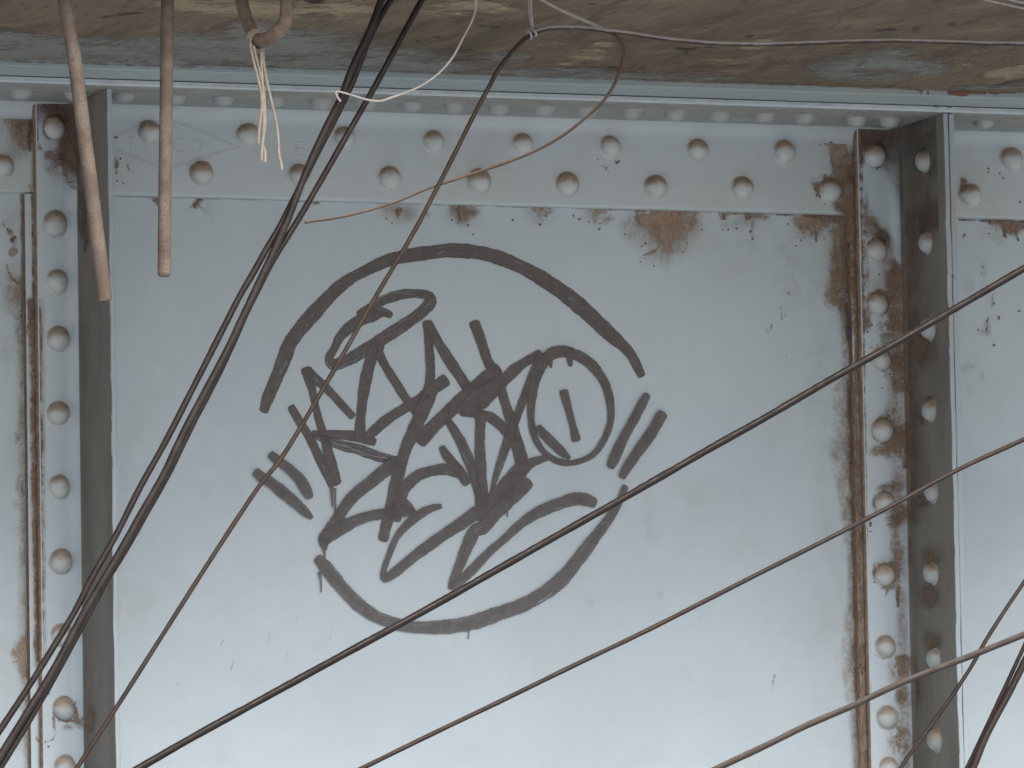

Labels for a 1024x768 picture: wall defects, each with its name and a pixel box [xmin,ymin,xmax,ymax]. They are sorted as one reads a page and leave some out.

rust [13,104,87,251]
rust [451,205,478,235]
rust [636,211,703,267]
rust [8,185,44,677]
rust [787,128,939,768]
rust [36,702,94,747]